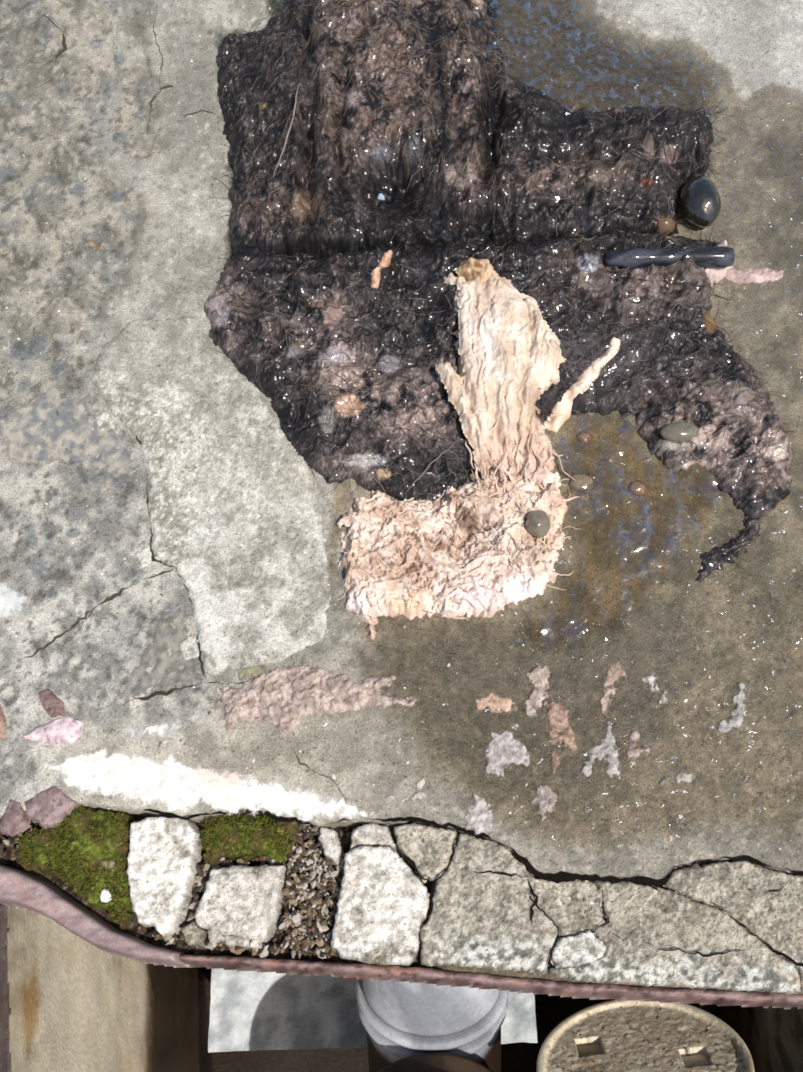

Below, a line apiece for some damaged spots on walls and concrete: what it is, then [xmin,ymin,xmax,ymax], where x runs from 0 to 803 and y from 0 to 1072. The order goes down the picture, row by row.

leakage [267,0,286,23]
leakage [477,0,803,426]
crack [19,436,255,720]
leakage [44,711,372,821]
crack [144,746,803,969]